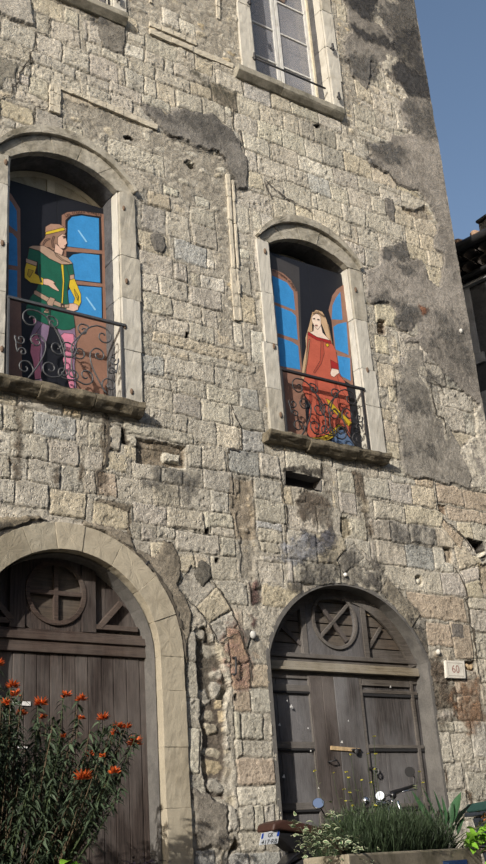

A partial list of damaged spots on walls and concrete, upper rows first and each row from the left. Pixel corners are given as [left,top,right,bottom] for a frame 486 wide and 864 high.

flaking render [0,0,36,27]
crack [0,17,51,104]
flaking render [141,104,248,191]
flaking render [342,0,486,494]
damp [281,490,387,595]
damp [351,470,366,509]
crack [434,483,472,550]
crack [454,567,481,681]
spalling [192,623,233,803]